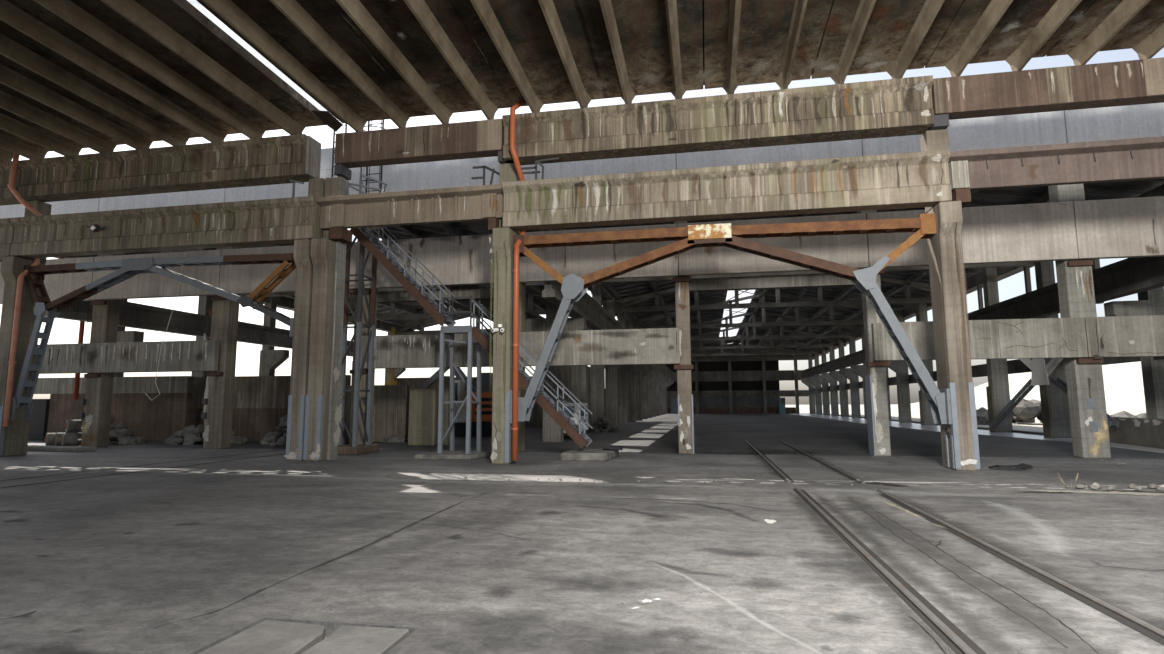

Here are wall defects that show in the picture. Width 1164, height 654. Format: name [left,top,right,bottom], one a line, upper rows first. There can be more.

damp [551,112,601,144]
damp [637,104,673,133]
damp [712,91,841,126]
damp [516,182,641,214]
damp [686,175,711,202]
spalling [284,367,343,460]